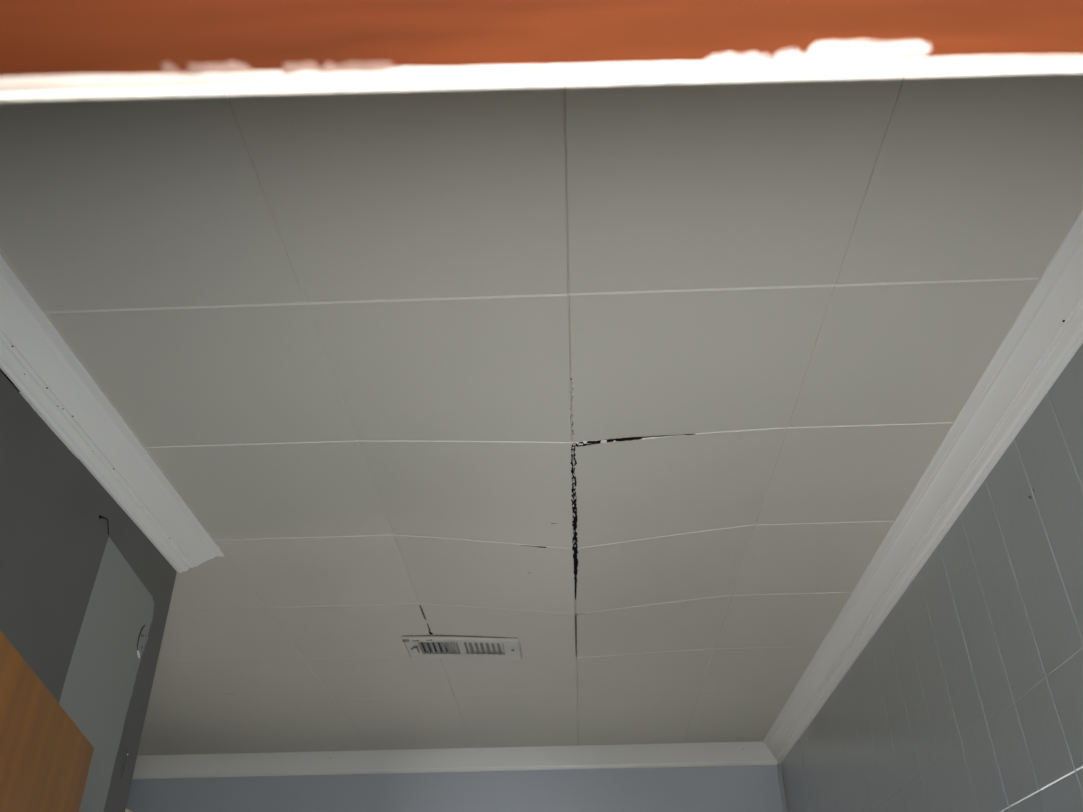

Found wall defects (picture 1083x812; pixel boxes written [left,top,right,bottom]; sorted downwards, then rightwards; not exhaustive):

crack [521,434,694,657]